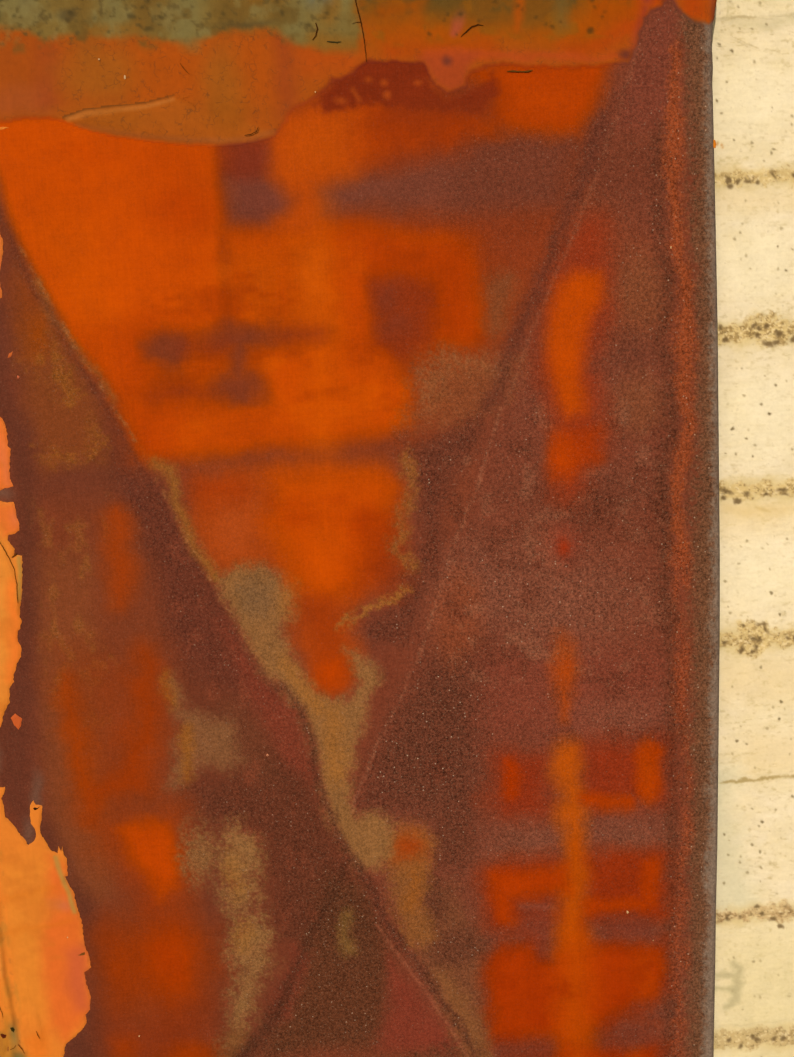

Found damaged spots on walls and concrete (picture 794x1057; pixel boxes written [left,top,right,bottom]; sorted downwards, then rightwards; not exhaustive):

peeling [0,0,741,147]
peeling [0,417,23,730]
peeling [0,787,91,1057]
rust [29,491,225,1057]
rust [0,62,628,692]
rust [465,36,705,1057]